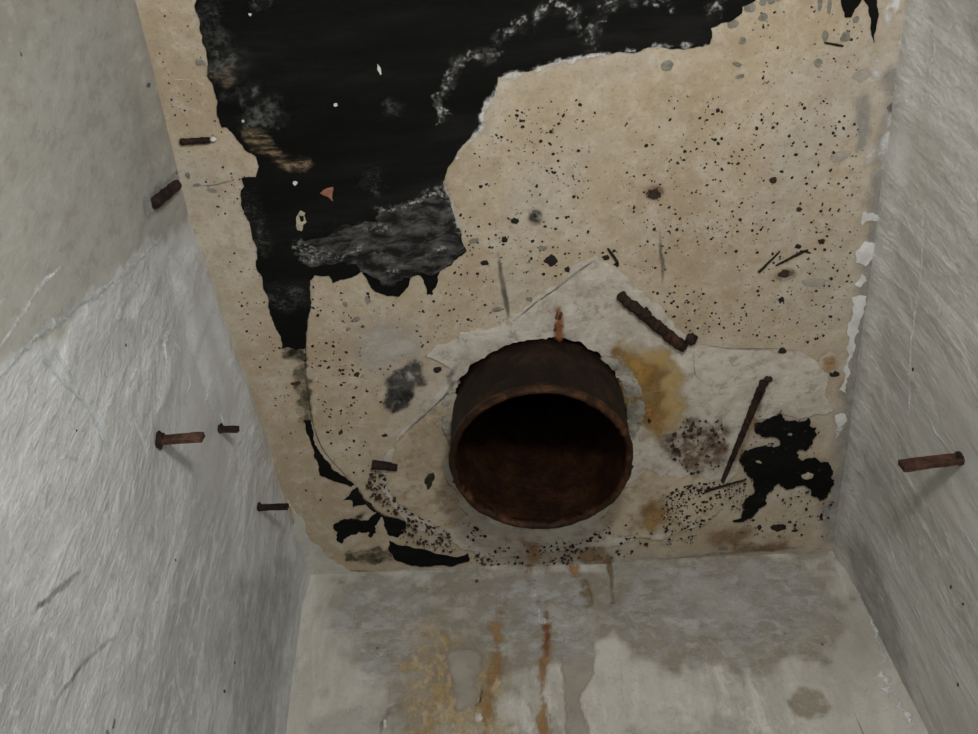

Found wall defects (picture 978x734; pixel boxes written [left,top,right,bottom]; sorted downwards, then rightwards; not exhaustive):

rust [144,175,182,216]
spalling [296,210,307,231]
spalling [647,186,663,200]
peeling [818,241,875,393]
rust [612,291,698,437]
rust [721,376,773,483]
peeling [344,487,406,538]
spalling [424,473,435,490]
water stain [345,260,872,730]
peeling [345,546,392,564]
rust [522,540,552,682]
rust [537,698,549,734]